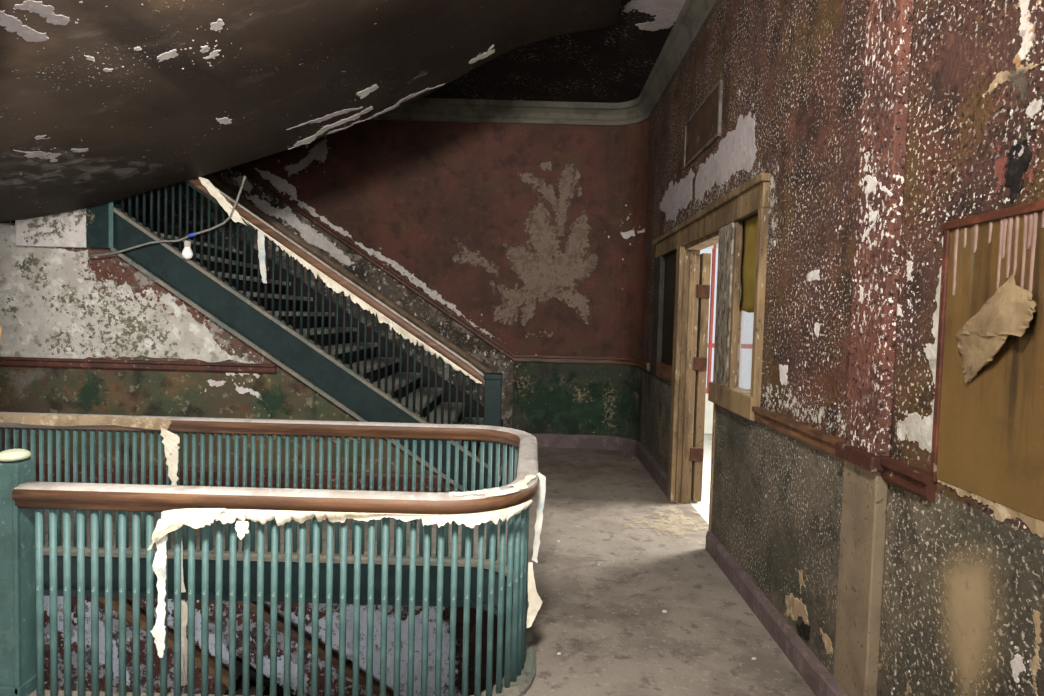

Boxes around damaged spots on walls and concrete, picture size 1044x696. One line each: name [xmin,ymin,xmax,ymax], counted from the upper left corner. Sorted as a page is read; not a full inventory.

peeling [0,0,79,49]
peeling [117,19,232,69]
peeling [620,0,686,31]
flaking render [657,103,779,247]
water stain [964,210,1044,293]
flaking render [0,208,263,390]
peeling [762,323,846,437]
flaking render [896,225,943,460]
peeling [0,413,180,485]
flaking render [937,479,1044,554]
peeling [145,472,546,696]
peeling [998,641,1033,688]